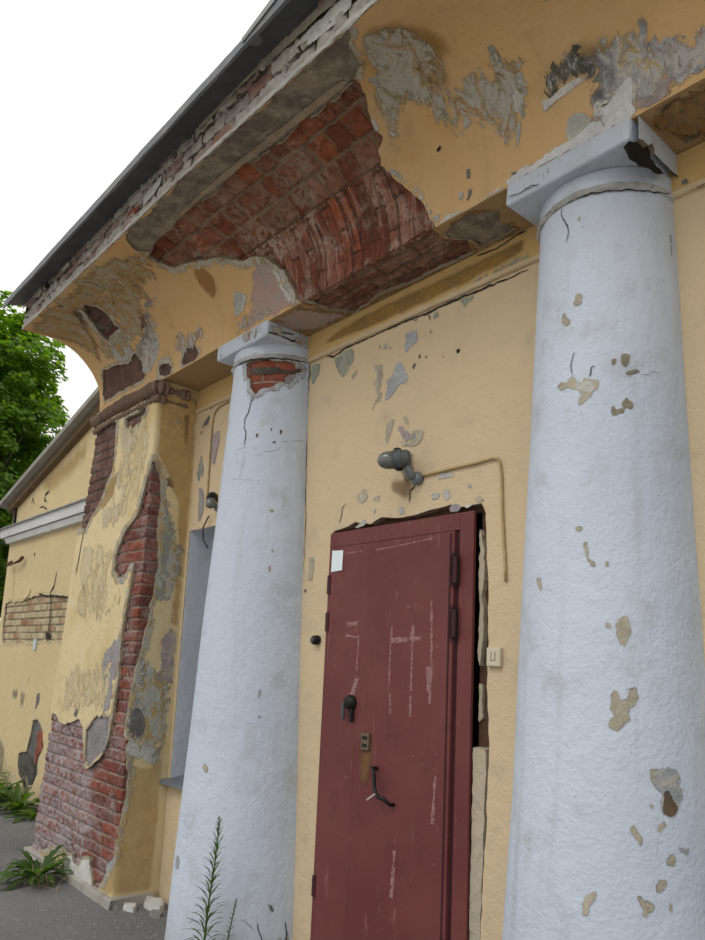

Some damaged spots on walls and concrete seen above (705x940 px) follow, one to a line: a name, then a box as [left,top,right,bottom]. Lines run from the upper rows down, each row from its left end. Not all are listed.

peeling [547,20,705,140]
flaking render [624,141,705,188]
flaking render [29,26,529,410]
crack [546,189,670,241]
peeling [557,353,599,405]
peeling [611,398,633,415]
peeling [612,353,658,377]
crack [232,397,307,486]
crack [303,483,345,570]
flaking render [1,415,185,890]
peeling [608,686,639,731]
flaking render [650,767,683,832]